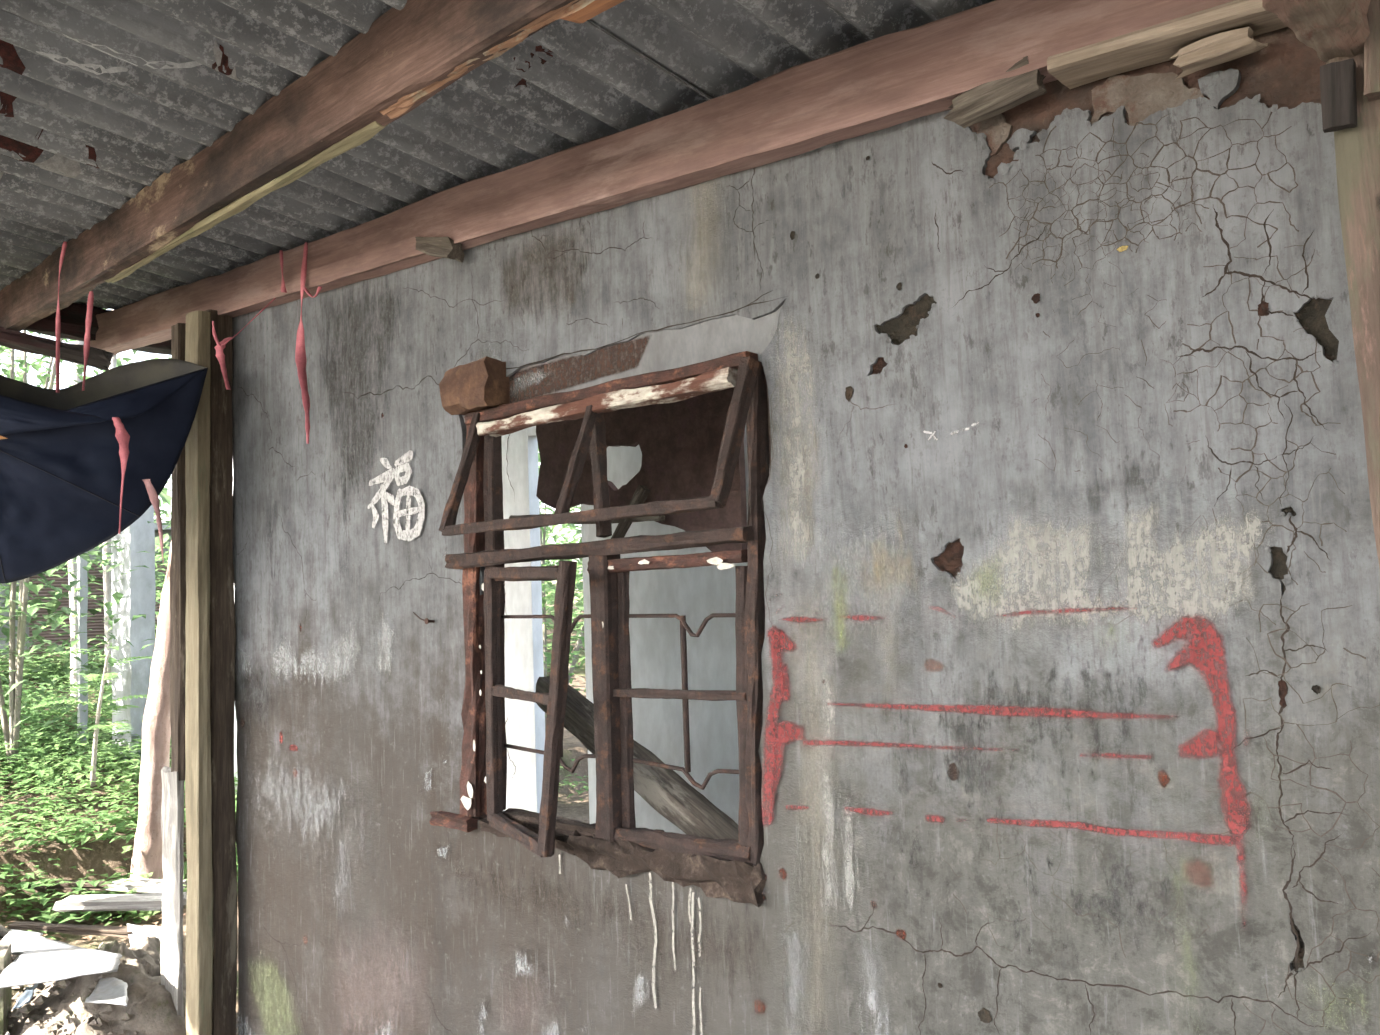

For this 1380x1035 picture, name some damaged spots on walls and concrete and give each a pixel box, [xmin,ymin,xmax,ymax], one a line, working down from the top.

spalling [968,27,1326,186]
spalling [867,294,937,375]
spalling [1295,295,1339,364]
peeling [515,373,544,393]
spalling [1279,507,1296,517]
crack [800,112,1380,1035]
peeling [933,506,1291,630]